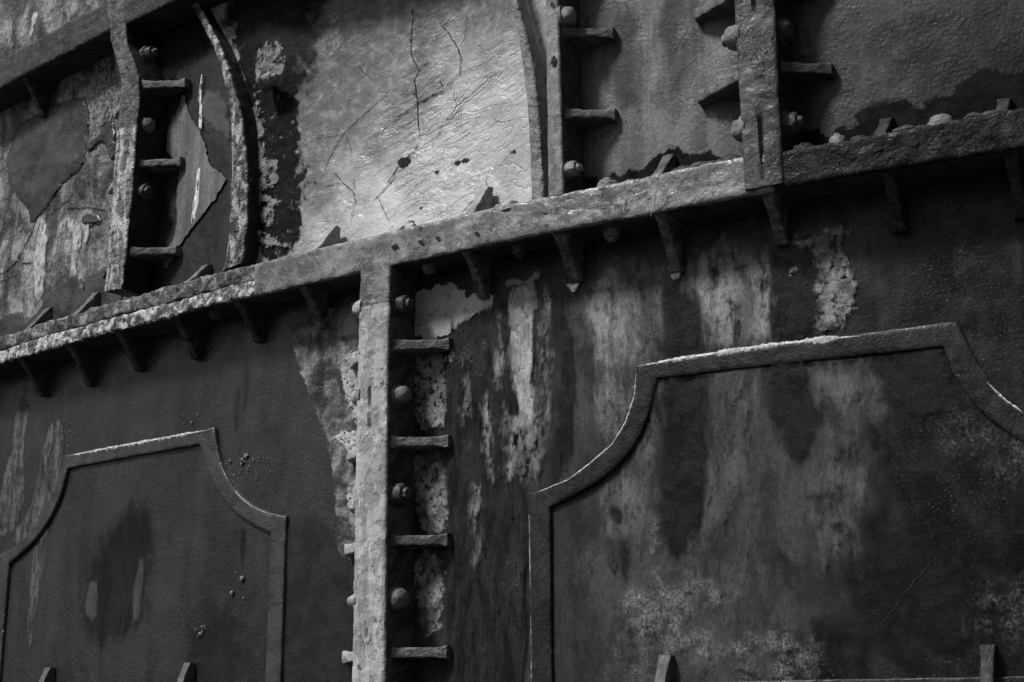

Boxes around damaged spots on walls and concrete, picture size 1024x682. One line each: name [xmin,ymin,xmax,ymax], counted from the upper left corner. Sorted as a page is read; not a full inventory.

peeling [7,97,116,223]
peeling [81,213,101,226]
peeling [230,24,316,261]
crack [312,8,500,222]
peeling [415,282,494,340]
damp [0,398,217,644]
peeling [292,301,359,563]
damp [414,225,859,682]
damp [555,348,1024,682]